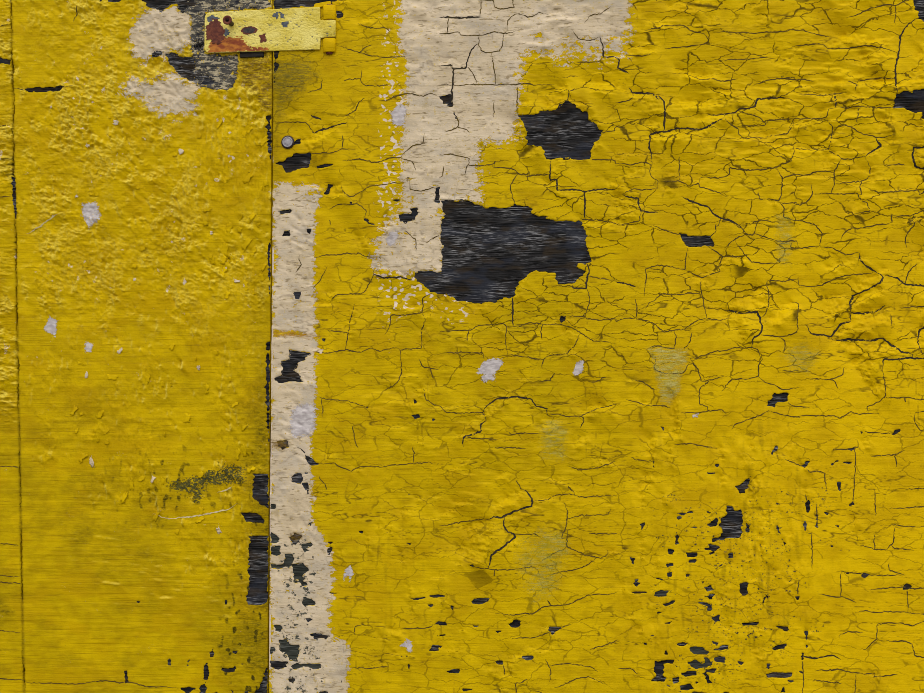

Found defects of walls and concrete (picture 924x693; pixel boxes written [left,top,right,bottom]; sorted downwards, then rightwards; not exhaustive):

peeling [913,0,924,21]
peeling [115,0,343,123]
rust [205,18,272,111]
peeling [893,90,924,119]
peeling [364,0,636,304]
crack [279,0,924,693]
peeling [208,115,352,693]
spalling [632,534,679,614]
peeling [686,506,750,566]
crack [0,678,183,688]
spalling [181,649,217,693]
spalling [766,664,803,692]